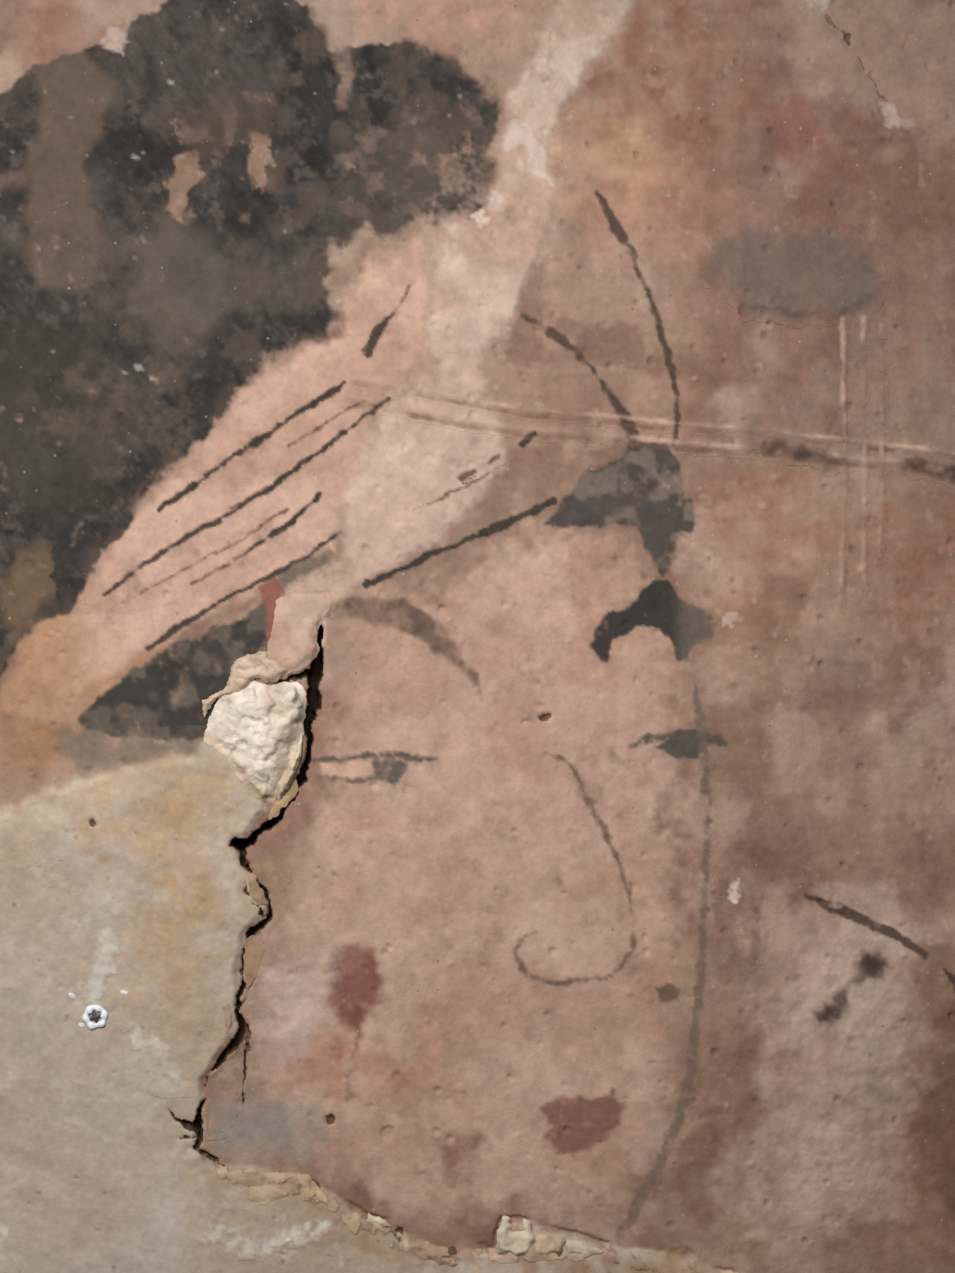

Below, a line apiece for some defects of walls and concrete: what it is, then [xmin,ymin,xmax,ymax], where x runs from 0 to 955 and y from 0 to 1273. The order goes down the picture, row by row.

crack [169,624,323,1165]
spalling [725,877,744,906]
spalling [807,879,866,917]
spalling [215,1162,459,1266]
spalling [475,1215,619,1263]